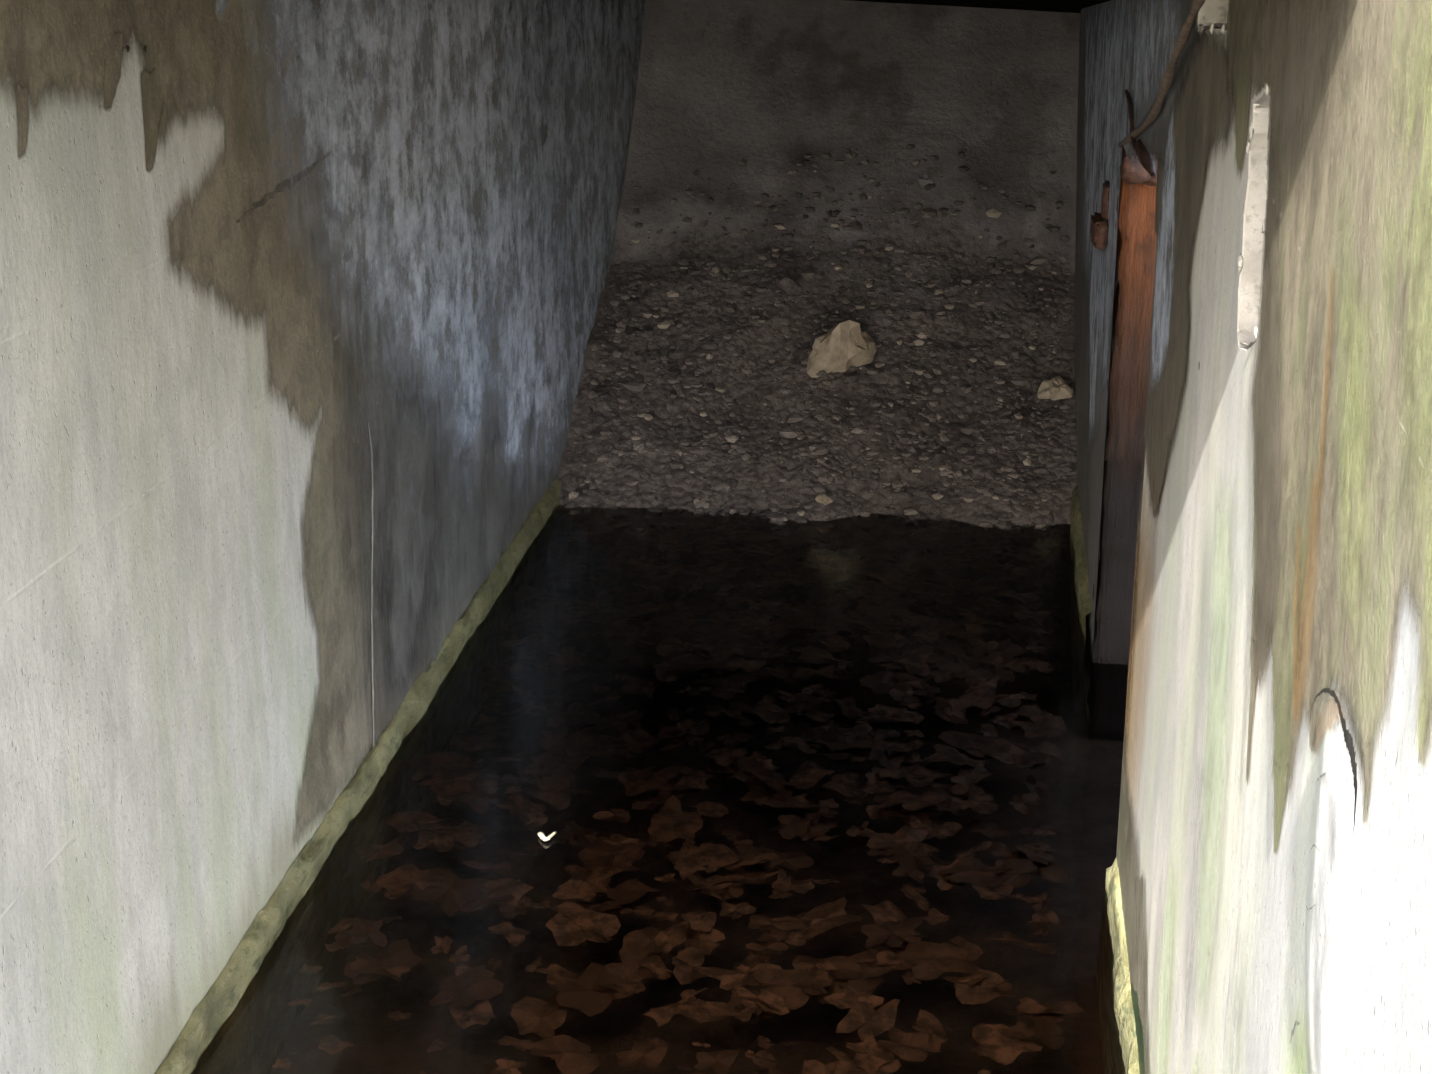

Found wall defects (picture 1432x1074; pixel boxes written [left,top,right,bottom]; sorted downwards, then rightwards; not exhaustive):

leakage [0,0,646,842]
leakage [1075,0,1432,853]
crack [1310,687,1357,869]